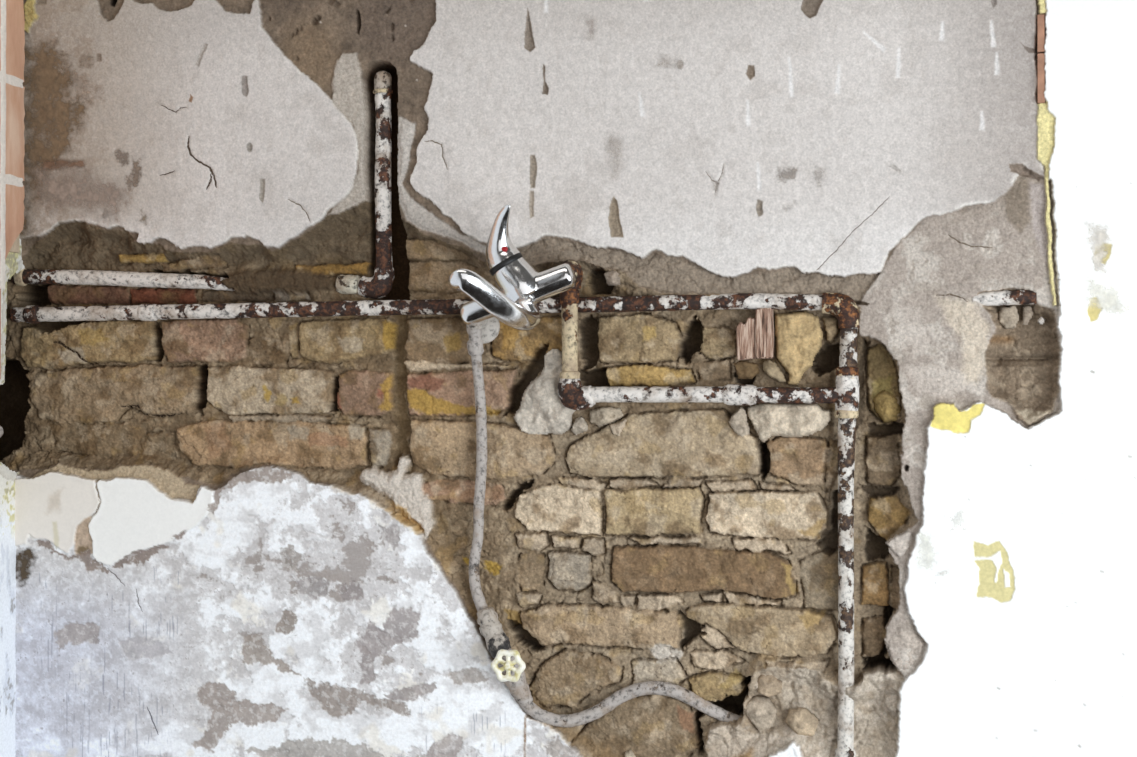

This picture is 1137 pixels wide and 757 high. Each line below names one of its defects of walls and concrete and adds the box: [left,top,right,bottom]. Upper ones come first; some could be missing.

crack [160,138,217,190]
flaking render [0,0,840,757]
peeling [974,541,1016,603]